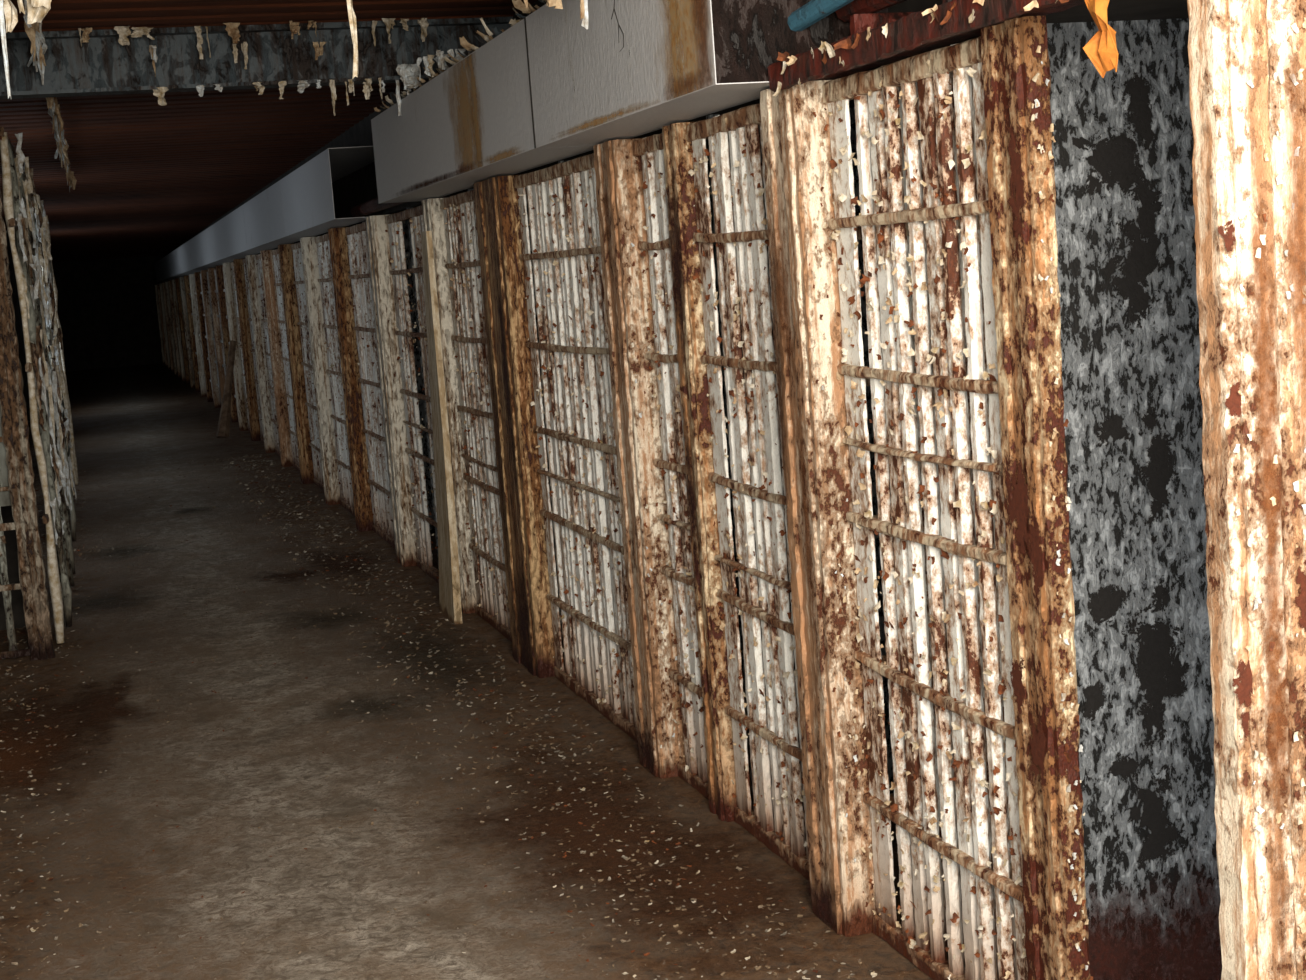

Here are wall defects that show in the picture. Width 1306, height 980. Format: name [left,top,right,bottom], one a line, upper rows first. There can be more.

peeling [0,0,77,192]
peeling [78,27,92,47]
peeling [114,26,169,106]
peeling [0,127,77,544]
corrosion [488,285,517,562]
corrosion [666,192,686,368]
corrosion [686,429,699,580]
corrosion [774,251,791,485]
corrosion [803,477,812,584]
corrosion [1255,230,1284,810]
corrosion [1291,103,1306,336]
corrosion [1088,880,1222,980]